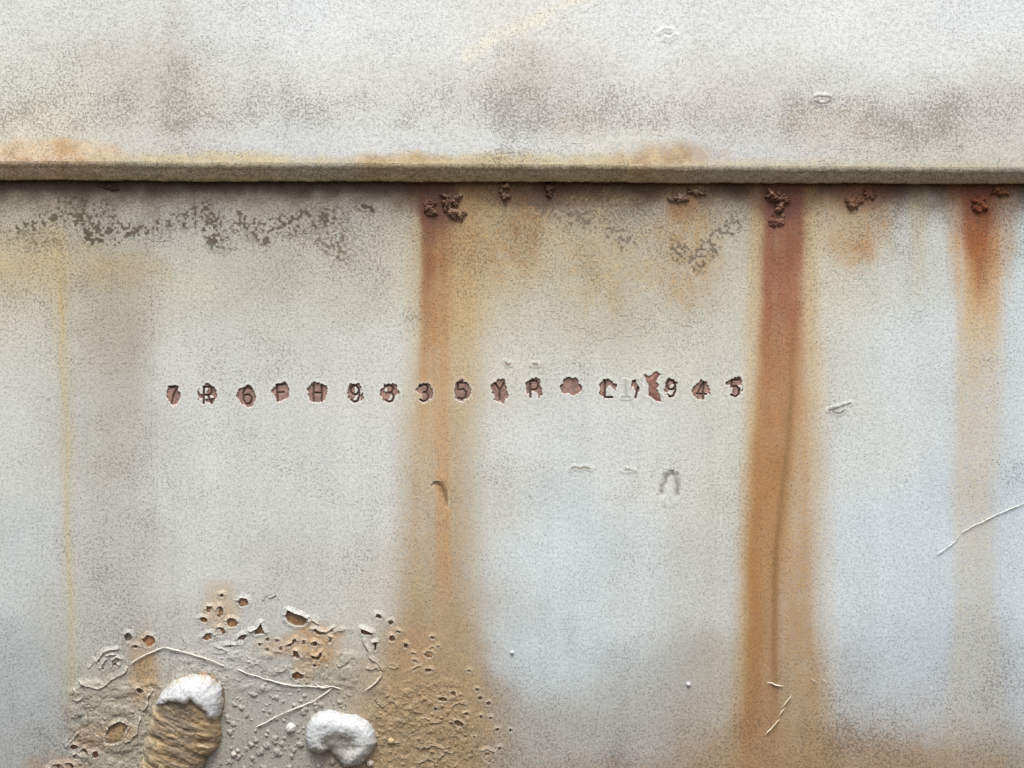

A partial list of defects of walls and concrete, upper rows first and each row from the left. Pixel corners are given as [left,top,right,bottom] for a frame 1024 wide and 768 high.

mould [524,193,641,257]
mould [660,204,753,280]
water stain [0,190,379,682]
rust [352,181,1024,768]
peeling [194,589,337,683]
peeling [357,609,444,676]
peeling [42,628,190,768]
peeling [431,666,517,766]